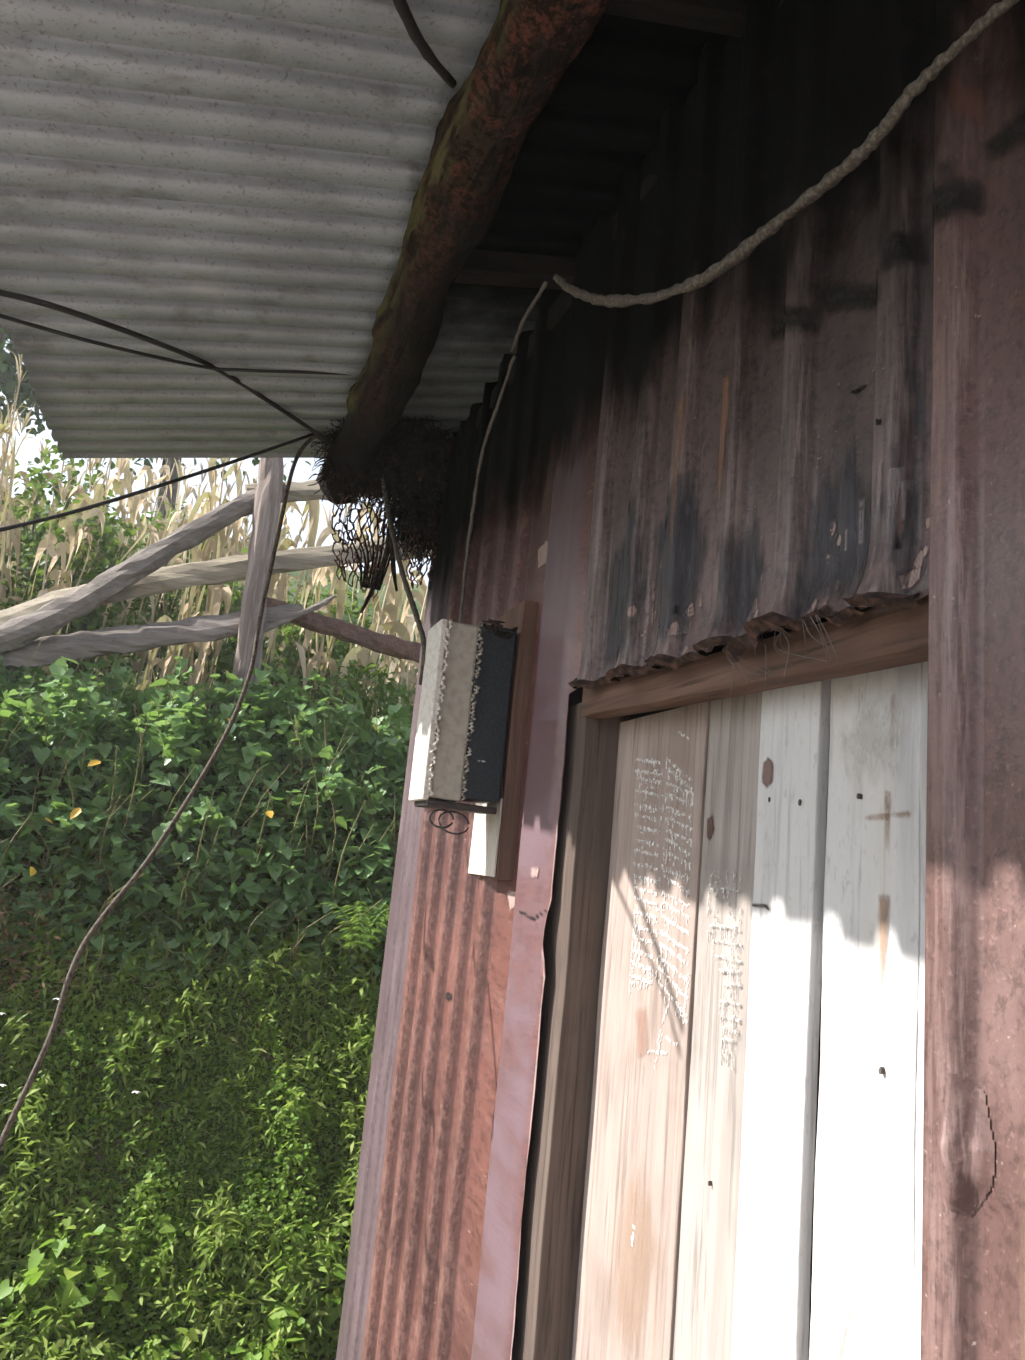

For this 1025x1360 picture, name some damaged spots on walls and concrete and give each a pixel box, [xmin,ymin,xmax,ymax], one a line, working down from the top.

leakage [845,463,914,579]